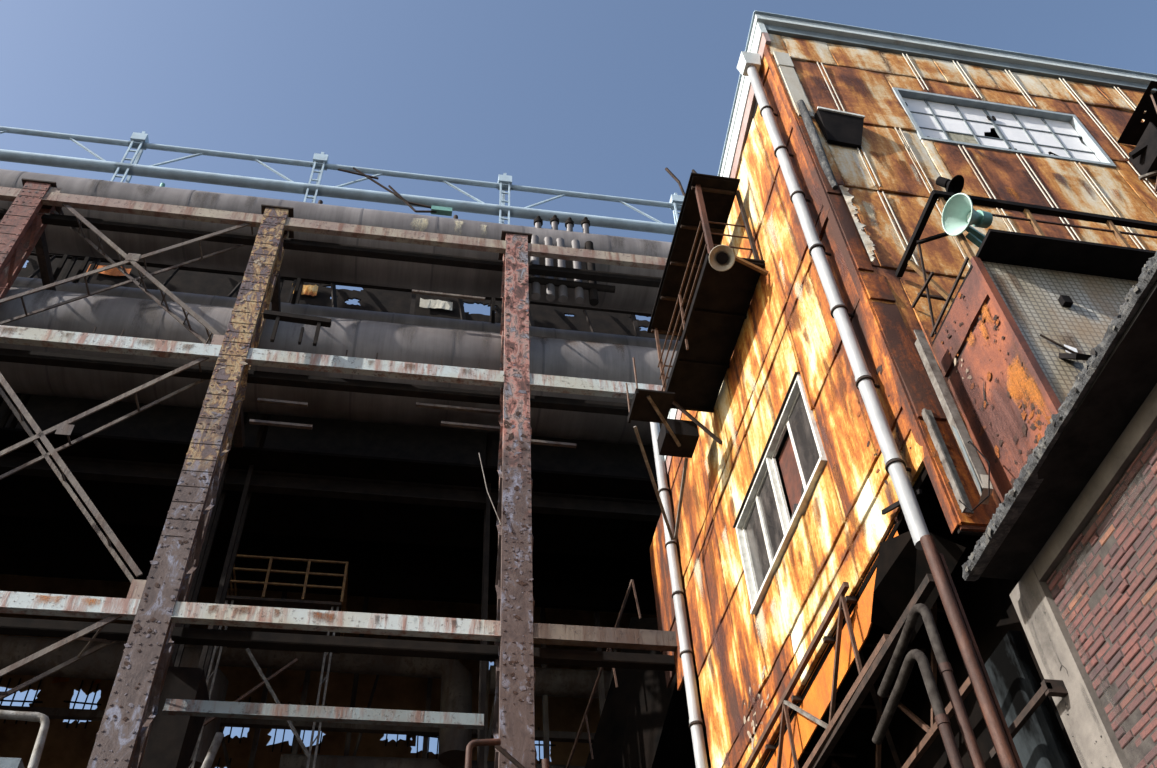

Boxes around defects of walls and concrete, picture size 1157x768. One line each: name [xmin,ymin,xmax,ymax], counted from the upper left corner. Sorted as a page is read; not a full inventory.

rust [1053,173,1091,194]
rust [789,307,808,341]
rust [941,293,1051,488]
rust [823,358,892,505]
rust [845,511,865,549]
rust [708,625,726,677]